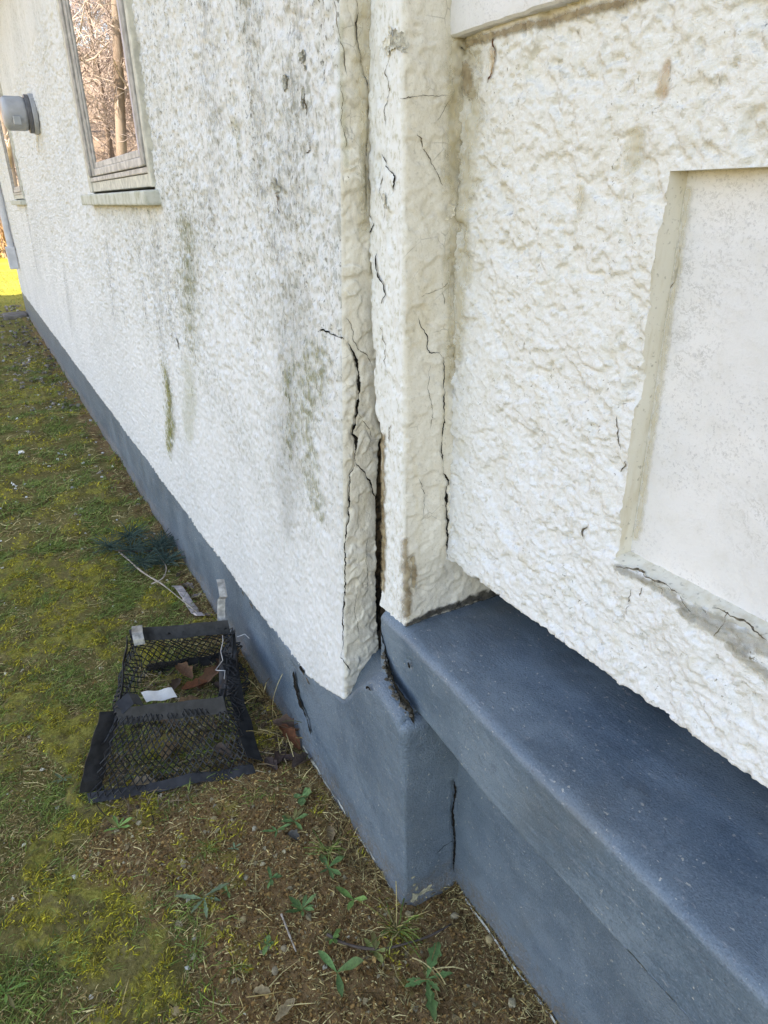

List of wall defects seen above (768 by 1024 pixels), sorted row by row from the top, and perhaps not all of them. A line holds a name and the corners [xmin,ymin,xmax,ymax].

crack [334,1,458,303]
leakage [175,213,198,359]
leakage [161,360,176,460]
leakage [282,334,330,522]
crack [418,282,449,556]
crack [318,318,414,723]
crack [616,566,690,611]
crack [714,608,767,641]
crack [292,666,311,734]
crack [437,782,457,870]